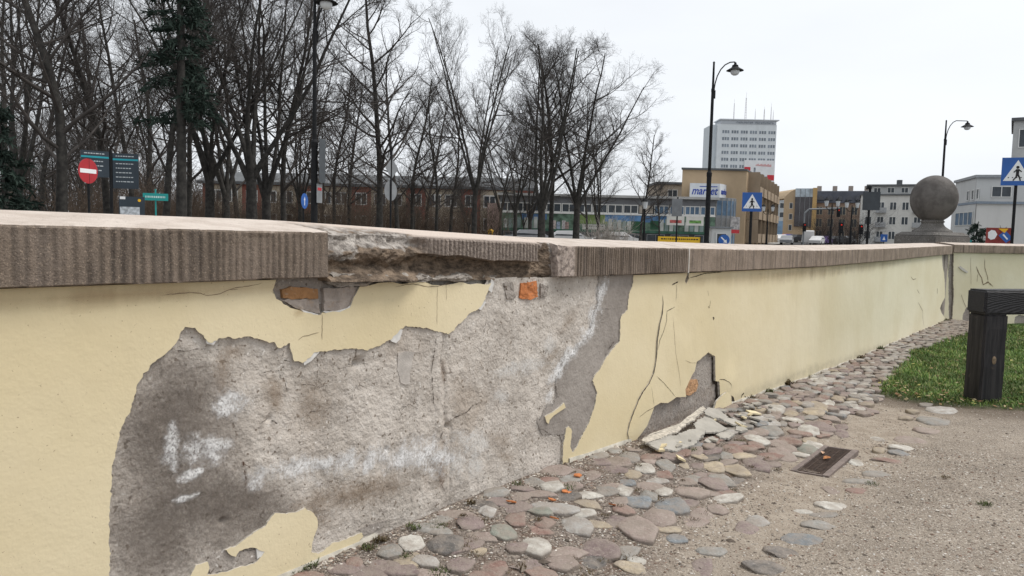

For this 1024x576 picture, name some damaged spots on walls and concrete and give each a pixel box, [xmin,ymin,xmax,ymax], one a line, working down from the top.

crack [167,283,261,296]
flaking render [108,220,635,576]
crack [628,272,719,431]
flaking render [640,353,732,436]